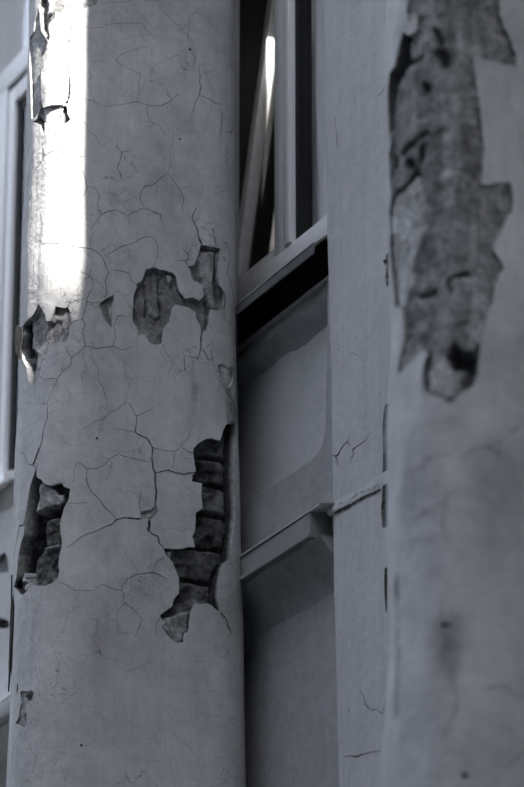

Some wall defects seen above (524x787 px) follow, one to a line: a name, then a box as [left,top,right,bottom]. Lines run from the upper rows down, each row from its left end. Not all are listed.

peeling [30,0,97,134]
spalling [383,0,517,404]
spalling [15,305,72,385]
crack [20,0,234,635]
spalling [132,245,224,345]
spalling [0,447,70,692]
spalling [160,364,238,643]
crack [333,404,388,528]
spalling [16,691,34,728]